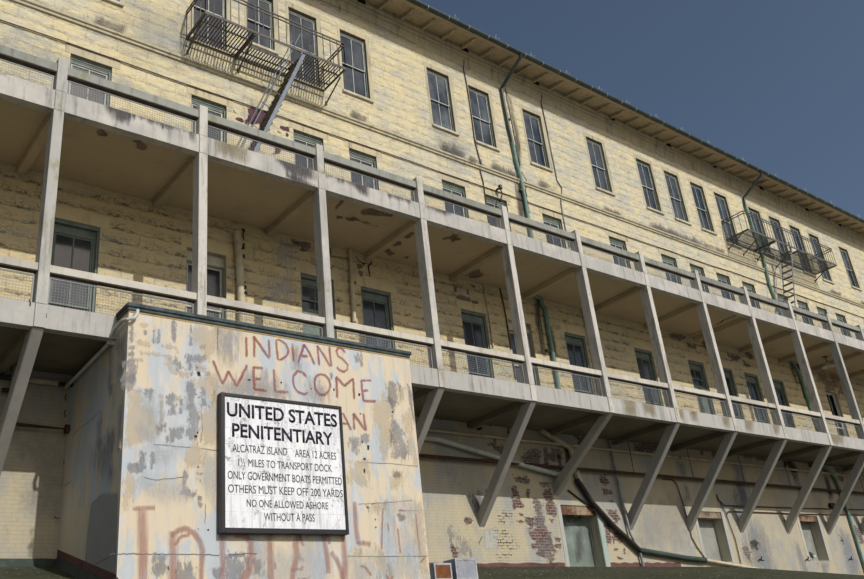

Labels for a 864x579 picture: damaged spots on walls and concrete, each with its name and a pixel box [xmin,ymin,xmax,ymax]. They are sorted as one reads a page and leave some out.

water stain [109,107,173,128]
peeling [233,107,267,125]
water stain [278,159,312,185]
spalling [335,200,393,226]
peeling [498,474,562,564]
peeling [599,474,626,560]